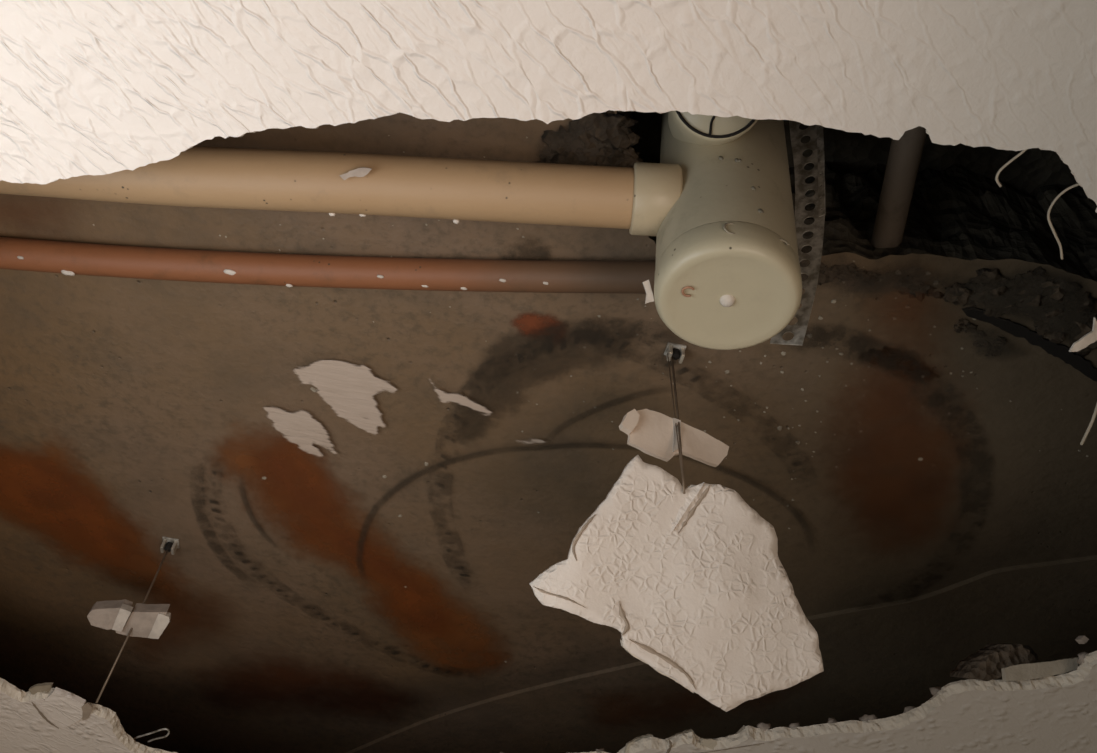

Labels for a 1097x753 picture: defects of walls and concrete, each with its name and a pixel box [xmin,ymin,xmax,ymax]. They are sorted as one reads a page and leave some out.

spalling [536,110,666,168]
spalling [783,120,1097,357]
rust [513,314,565,342]
rust [221,438,505,672]
flaking render [0,678,54,702]
flaking render [86,702,177,753]
flaking render [580,651,1097,753]